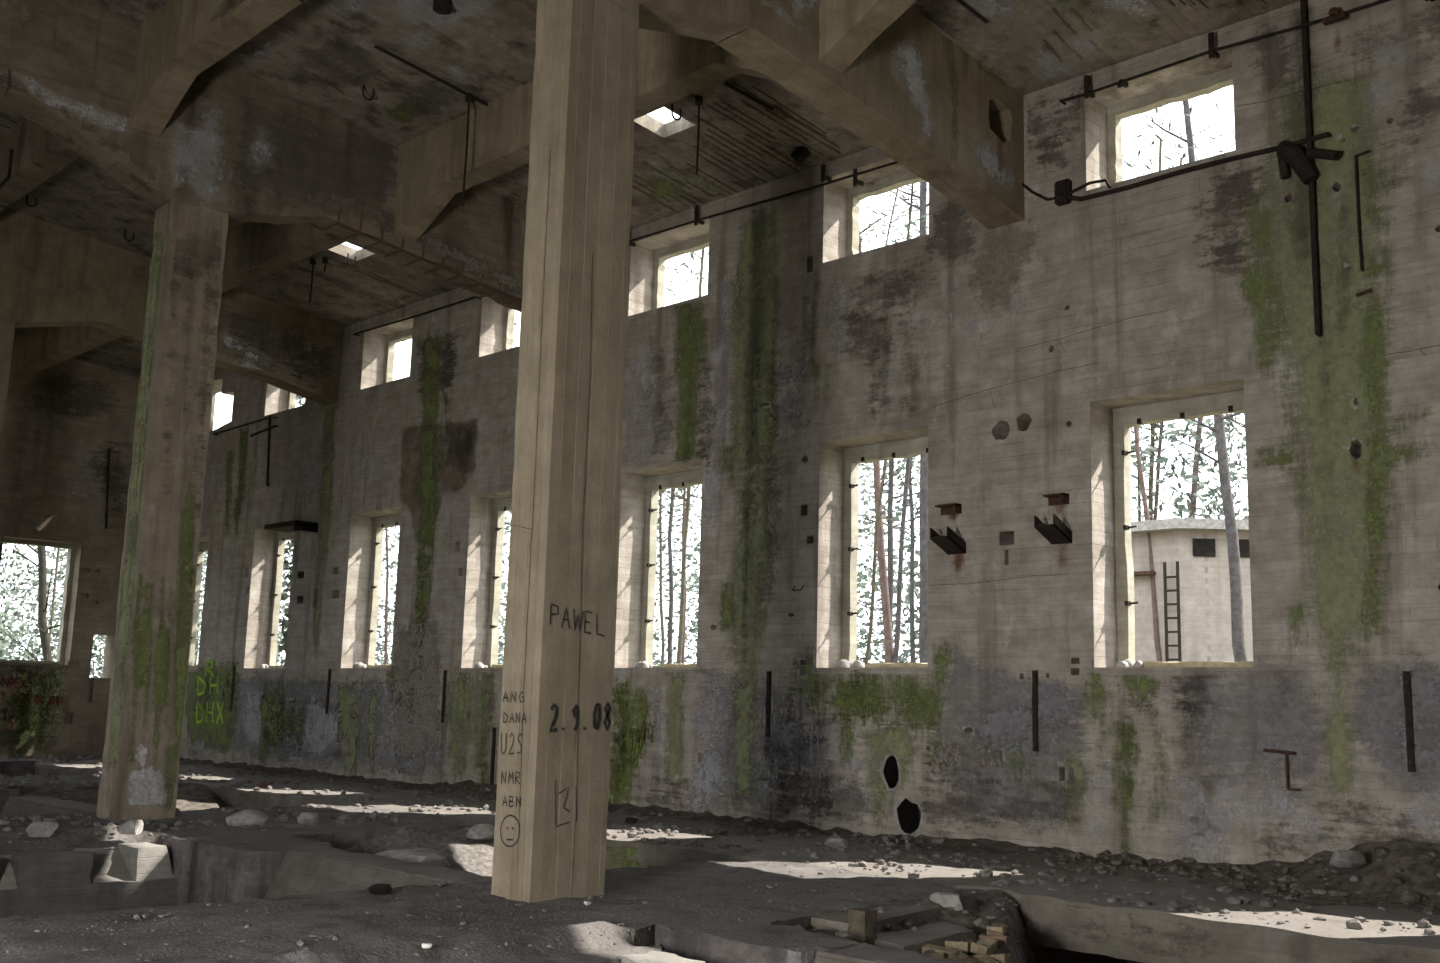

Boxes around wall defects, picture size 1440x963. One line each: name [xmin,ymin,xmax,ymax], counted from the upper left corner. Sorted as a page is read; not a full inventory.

water stain [1027,99,1080,165]
water stain [90,238,338,808]
water stain [401,335,477,680]
water stain [630,280,813,539]
water stain [921,764,1074,837]
water stain [1179,661,1433,862]